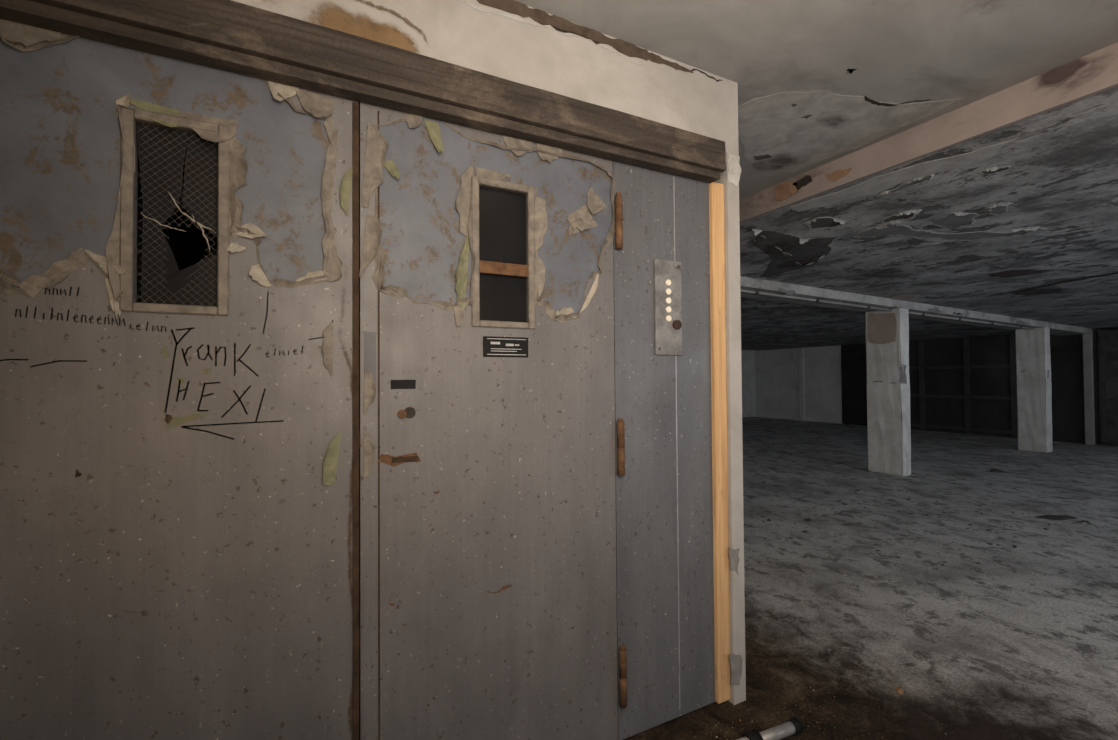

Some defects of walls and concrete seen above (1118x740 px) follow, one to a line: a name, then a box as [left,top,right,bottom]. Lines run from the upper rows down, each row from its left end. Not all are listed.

peeling [0,18,616,327]
peeling [727,90,1016,229]
peeling [855,202,1047,241]
peeling [867,295,919,344]
peeling [363,369,376,477]